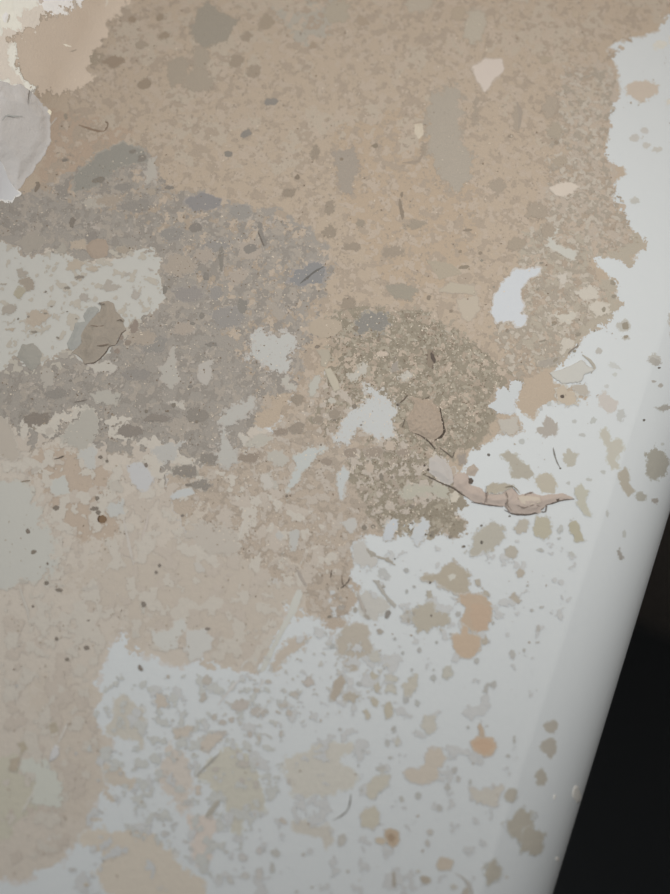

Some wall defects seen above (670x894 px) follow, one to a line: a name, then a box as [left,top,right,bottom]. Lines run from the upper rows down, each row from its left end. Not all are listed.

spalling [90,496,107,523]